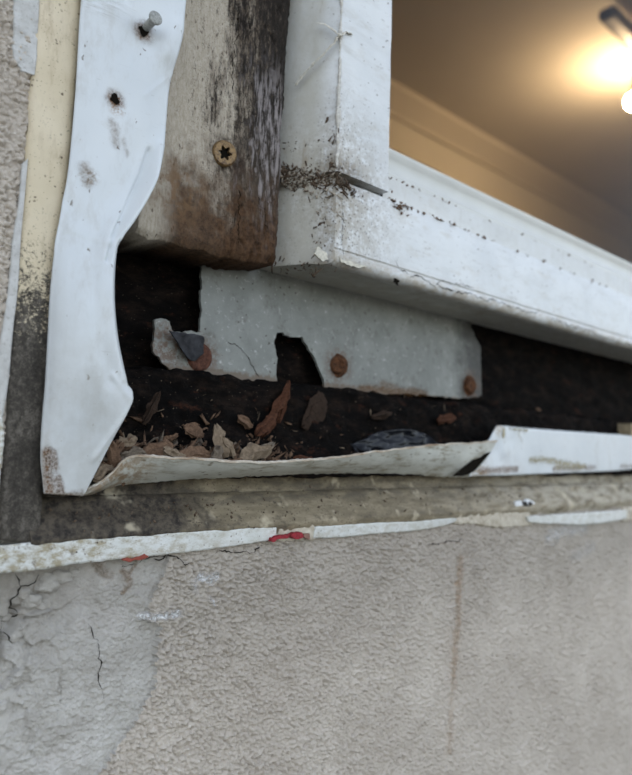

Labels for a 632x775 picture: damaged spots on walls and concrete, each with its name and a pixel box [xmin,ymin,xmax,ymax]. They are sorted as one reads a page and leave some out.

crack [1,575,39,643]
spalling [0,555,170,775]
crack [88,624,103,693]